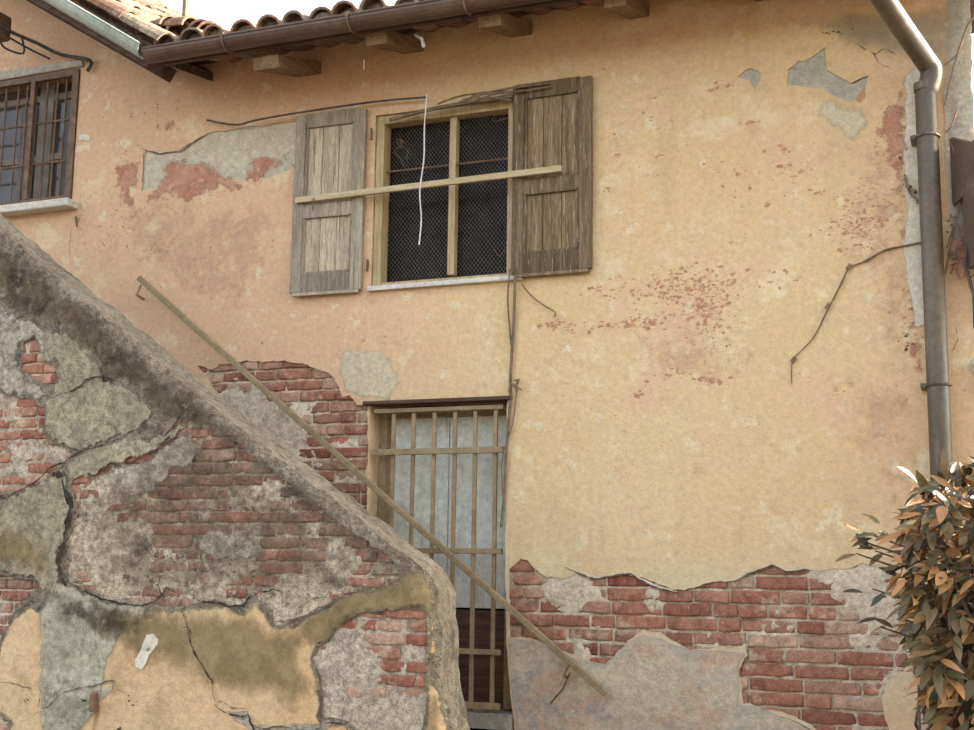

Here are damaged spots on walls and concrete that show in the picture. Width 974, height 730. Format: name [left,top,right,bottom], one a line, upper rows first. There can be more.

flaking render [787,49,868,103]
flaking render [99,121,296,287]
flaking render [21,331,61,385]
flaking render [199,333,398,510]
flaking render [0,574,40,638]
crack [0,376,348,730]
flaking render [0,393,407,626]
crack [275,588,376,622]
flaking render [506,559,908,730]